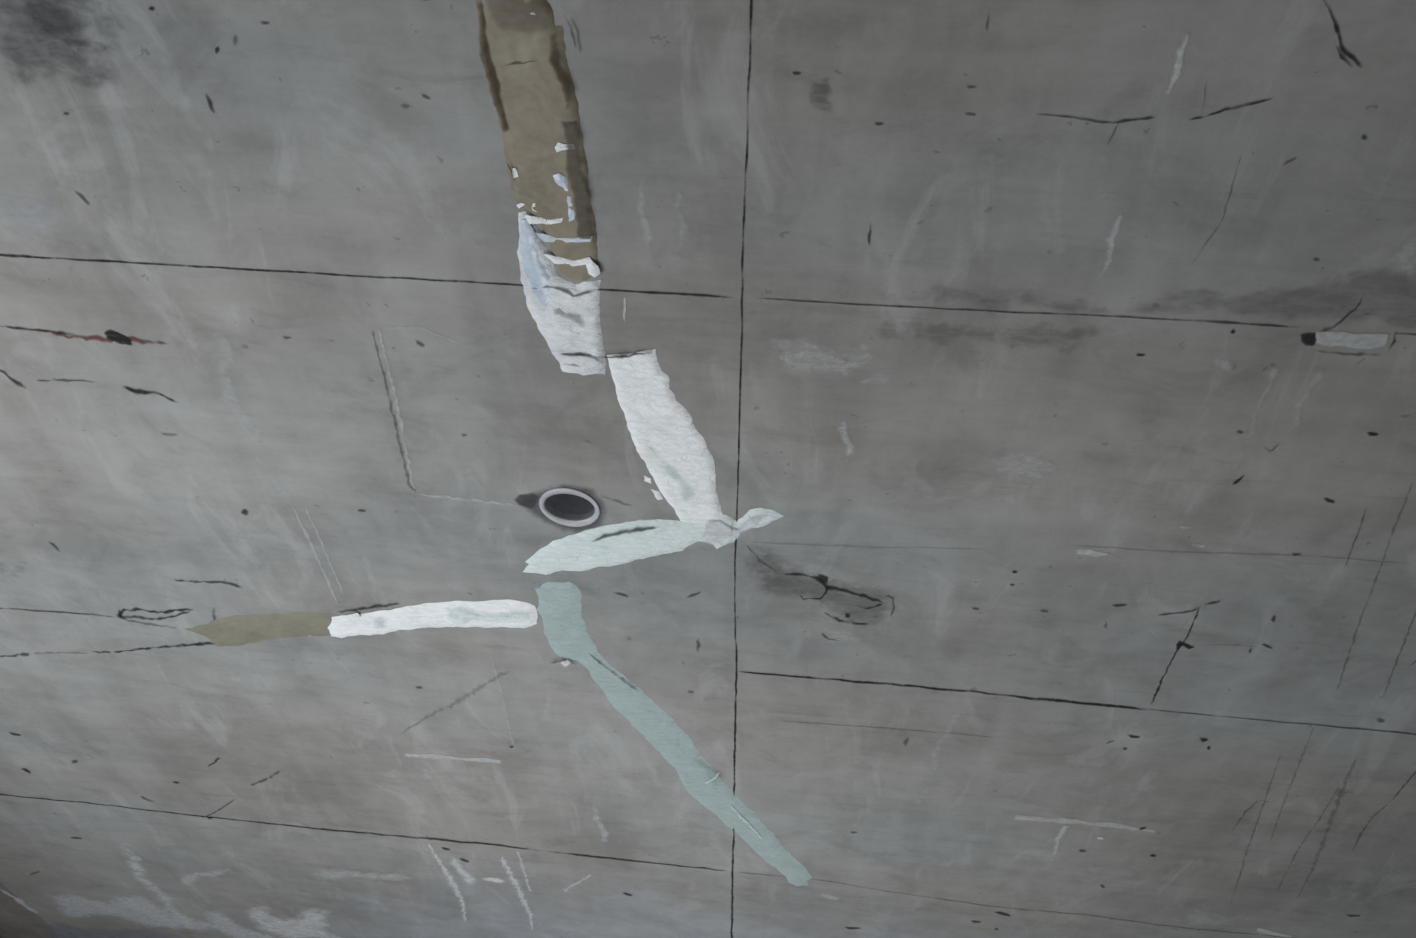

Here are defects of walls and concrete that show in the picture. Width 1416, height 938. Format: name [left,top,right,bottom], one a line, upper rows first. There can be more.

crack [1323,0,1360,66]
crack [476,0,600,282]
crack [7,327,164,345]
crack [0,370,79,387]
crack [126,387,174,402]
crack [97,580,332,653]
crack [786,573,894,639]
crack [1151,602,1216,704]